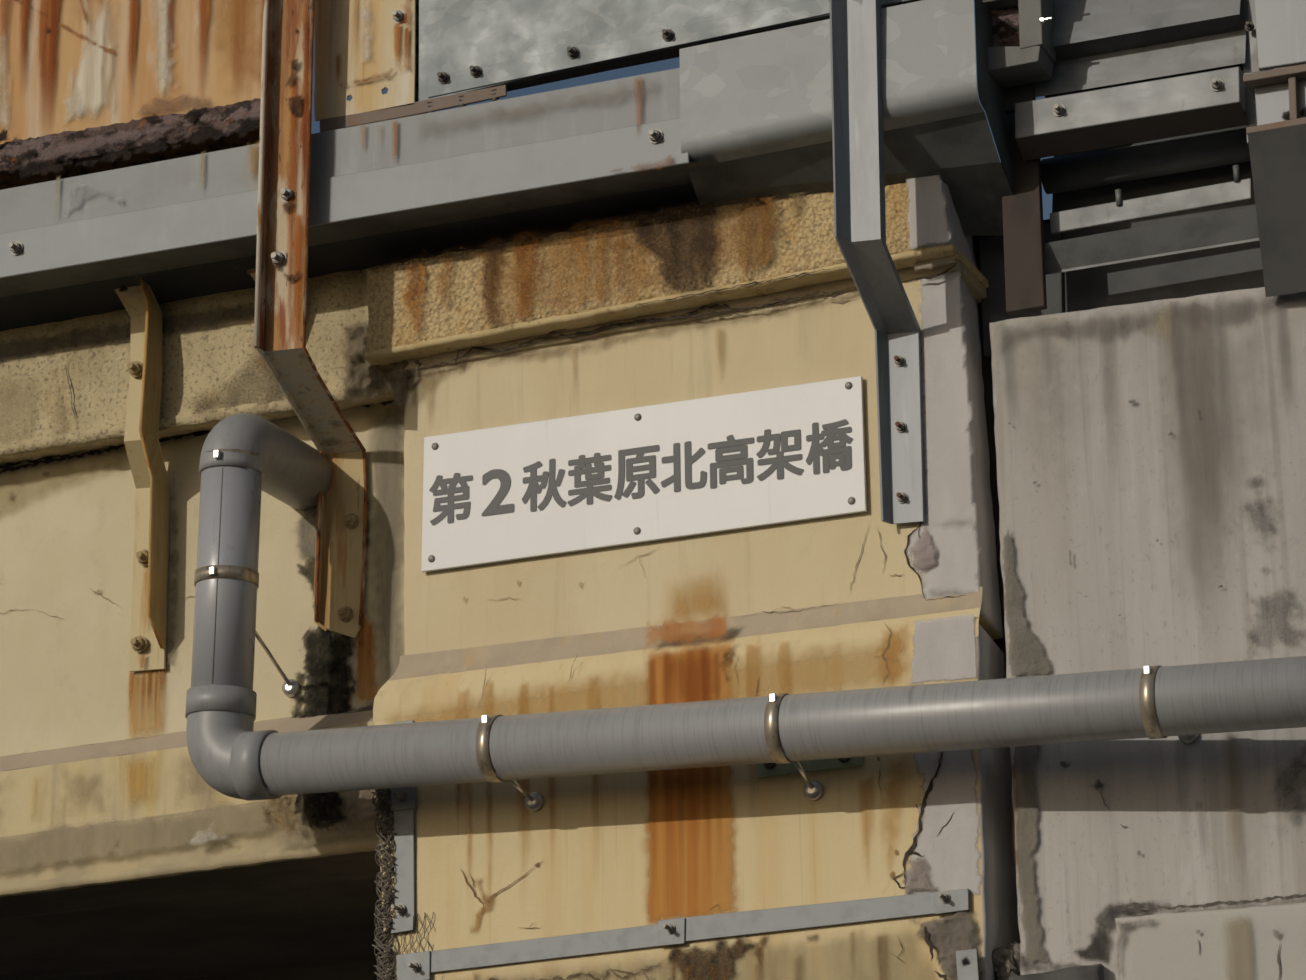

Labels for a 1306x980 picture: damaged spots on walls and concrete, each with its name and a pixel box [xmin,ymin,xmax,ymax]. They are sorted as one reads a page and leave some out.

corrosion [2,0,60,98]
corrosion [288,0,309,332]
crack [0,367,125,473]
crack [362,266,853,408]
peeling [906,175,979,599]
damp [297,558,315,607]
damp [292,626,360,718]
peeling [911,614,977,684]
damp [294,792,346,830]
corrosion [646,766,734,922]
crack [893,751,953,894]
peeling [890,749,981,895]